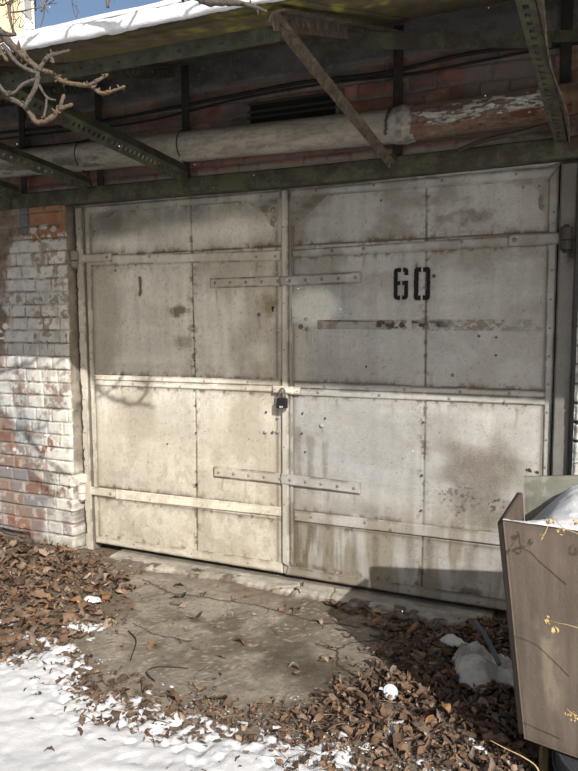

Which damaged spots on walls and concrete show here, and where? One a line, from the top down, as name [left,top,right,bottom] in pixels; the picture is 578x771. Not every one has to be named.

peeling [411,89,547,124]
peeling [29,224,66,241]
spalling [0,311,9,341]
crack [141,579,377,675]